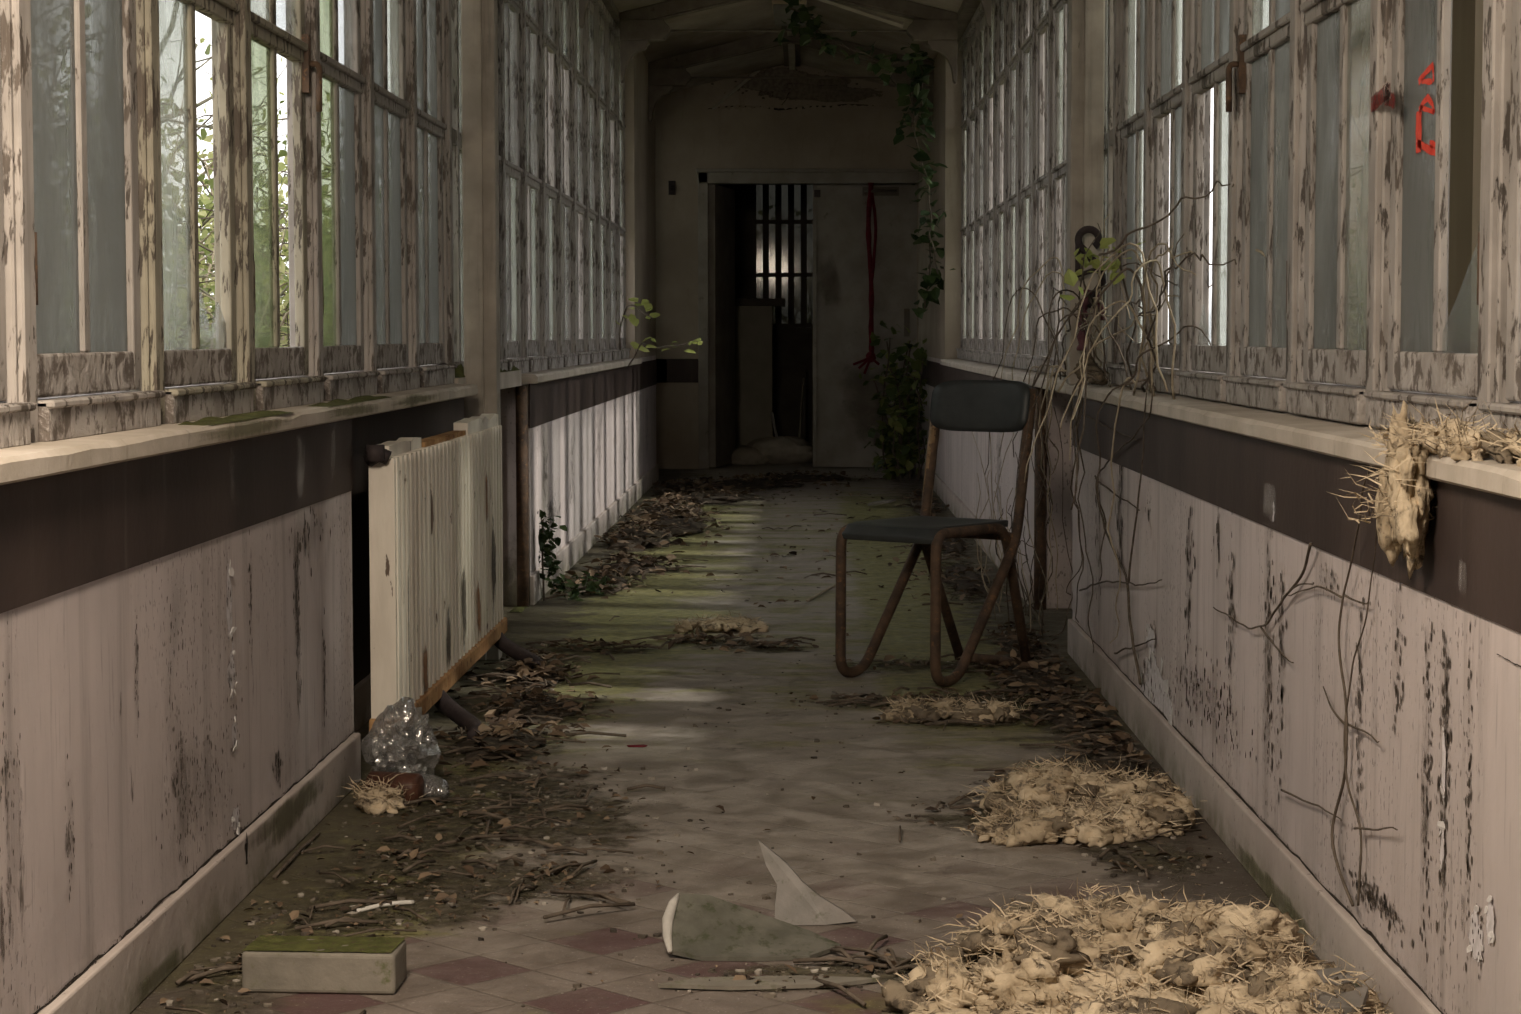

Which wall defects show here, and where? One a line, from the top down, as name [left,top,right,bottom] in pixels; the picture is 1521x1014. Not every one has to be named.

water stain [291,506,335,708]
water stain [1175,506,1287,806]
water stain [0,664,21,822]
water stain [0,849,24,961]
water stain [65,782,75,903]
water stain [156,695,233,864]
water stain [272,750,283,787]
water stain [1343,597,1472,963]